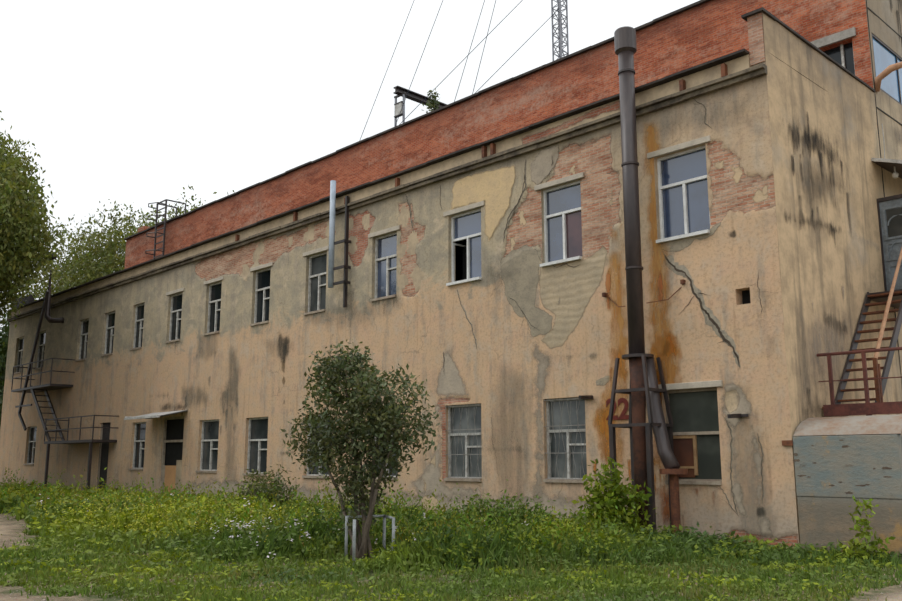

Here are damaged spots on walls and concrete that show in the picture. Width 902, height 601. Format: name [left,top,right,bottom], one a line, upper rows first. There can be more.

flaking render [195,220,336,281]
flaking render [348,211,376,266]
flaking render [397,202,426,297]
flaking render [504,134,621,261]
corrosion [646,125,679,405]
flaking render [707,140,776,226]
water stain [789,117,842,186]
water stain [279,337,288,362]
crack [457,290,477,349]
corrosion [605,259,627,397]
crack [664,254,741,368]
corrosion [593,384,621,472]